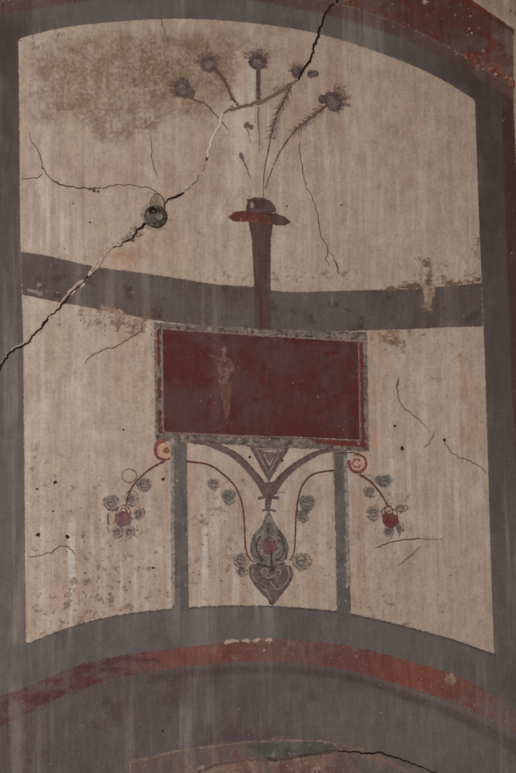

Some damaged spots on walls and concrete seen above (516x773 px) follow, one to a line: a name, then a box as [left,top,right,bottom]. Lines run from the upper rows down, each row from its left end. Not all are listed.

crack [0,0,349,371]
peeling [386,278,435,311]
crack [396,378,484,471]
crack [188,750,437,773]